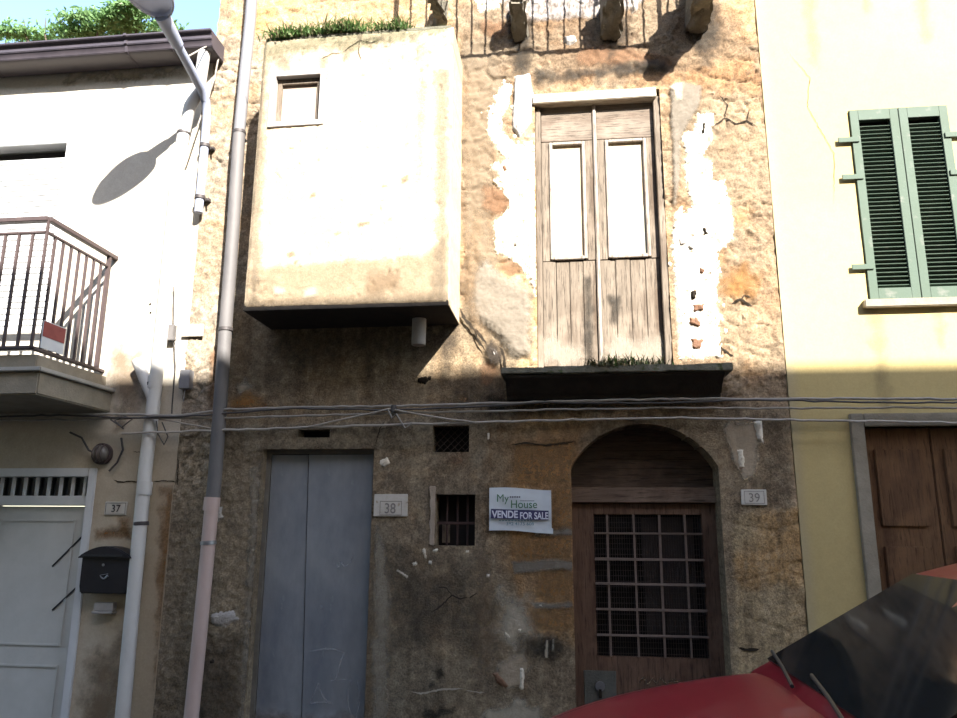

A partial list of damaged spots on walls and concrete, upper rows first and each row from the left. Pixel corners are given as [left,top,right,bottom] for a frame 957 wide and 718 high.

peeling [474,0,510,36]
spalling [525,0,600,19]
spalling [624,0,641,13]
peeling [481,79,536,297]
peeling [668,113,734,361]